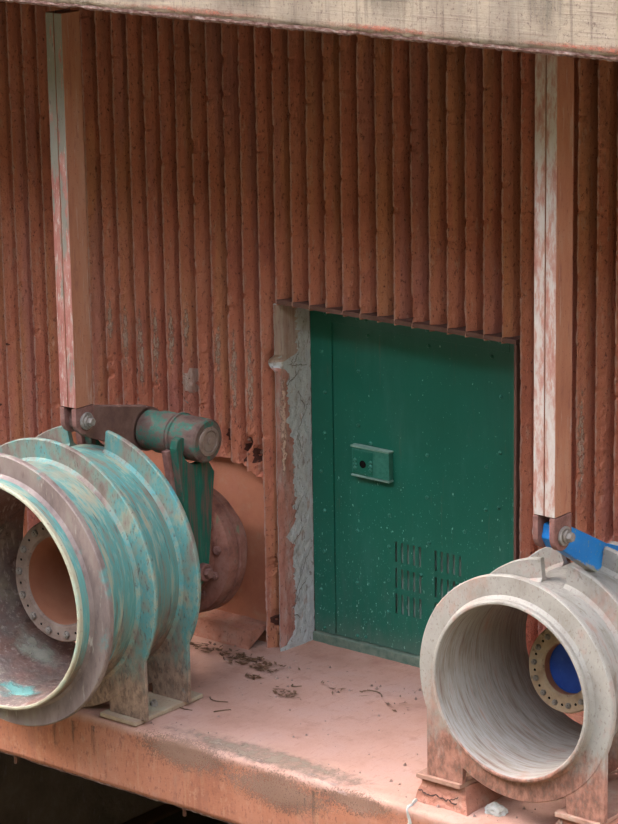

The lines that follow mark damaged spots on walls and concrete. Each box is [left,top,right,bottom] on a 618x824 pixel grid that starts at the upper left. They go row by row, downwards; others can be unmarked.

peeling [138,310,174,386]
spalling [244,437,263,463]
peeling [269,305,300,649]
crack [418,789,458,805]